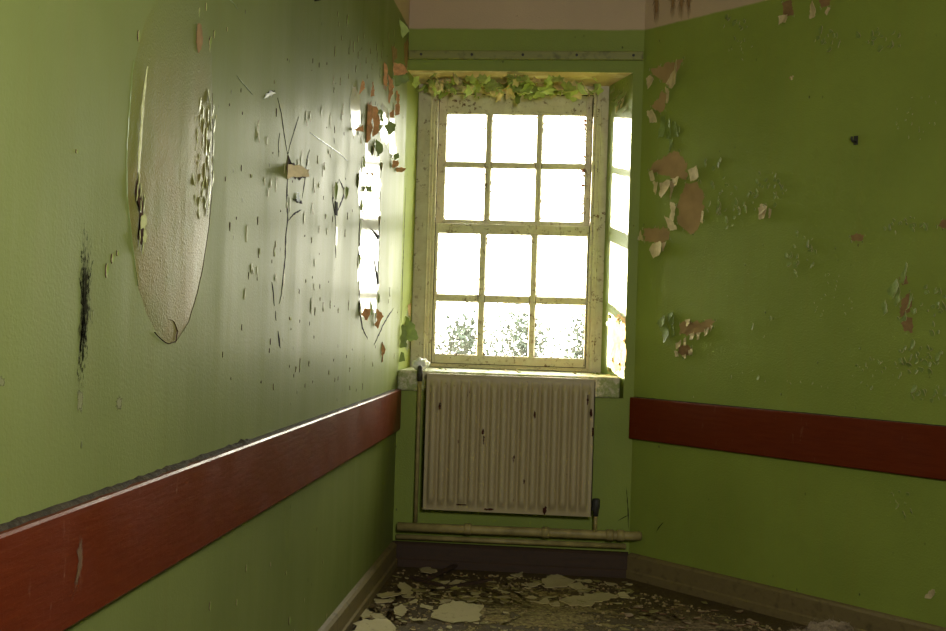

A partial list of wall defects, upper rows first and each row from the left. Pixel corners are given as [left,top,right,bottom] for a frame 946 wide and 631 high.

peeling [315,18,604,367]
peeling [638,56,705,258]
peeling [758,204,772,220]
damp [78,229,91,379]
spalling [573,314,626,375]
peeling [656,311,716,360]